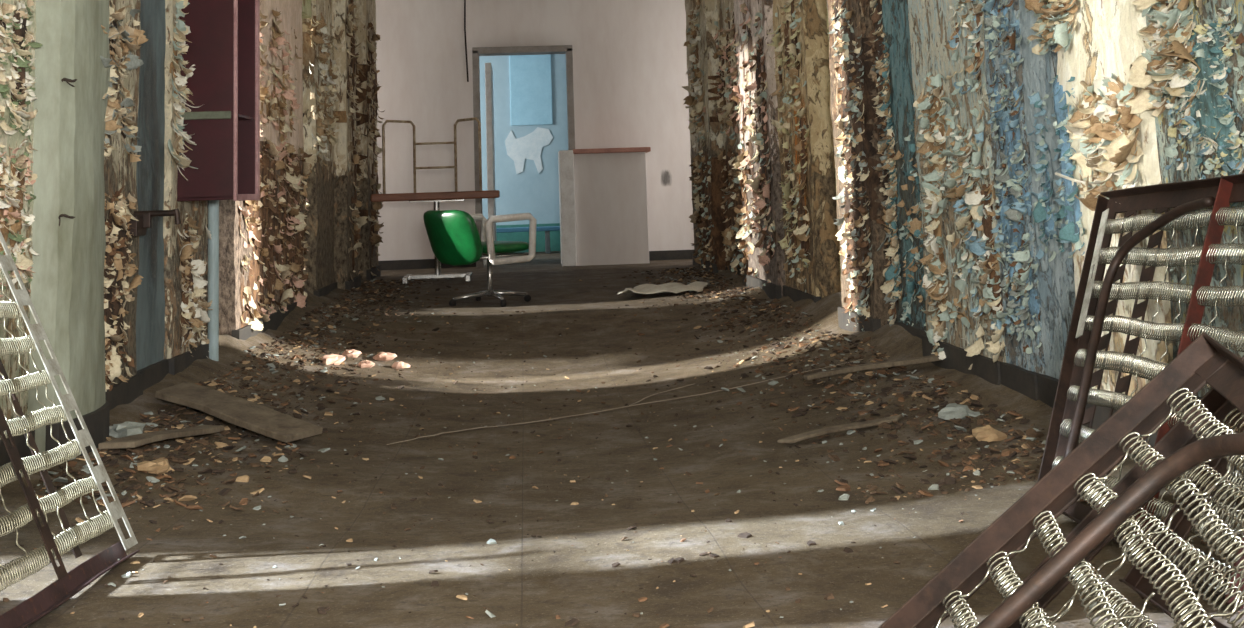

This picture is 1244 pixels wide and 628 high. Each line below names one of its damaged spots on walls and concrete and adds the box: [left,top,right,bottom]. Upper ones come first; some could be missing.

peeling [0,0,43,297]
peeling [104,186,143,392]
peeling [100,0,149,162]
peeling [168,0,200,181]
peeling [177,206,212,358]
spalling [238,0,385,331]
spalling [682,0,811,293]
spalling [827,0,1244,370]